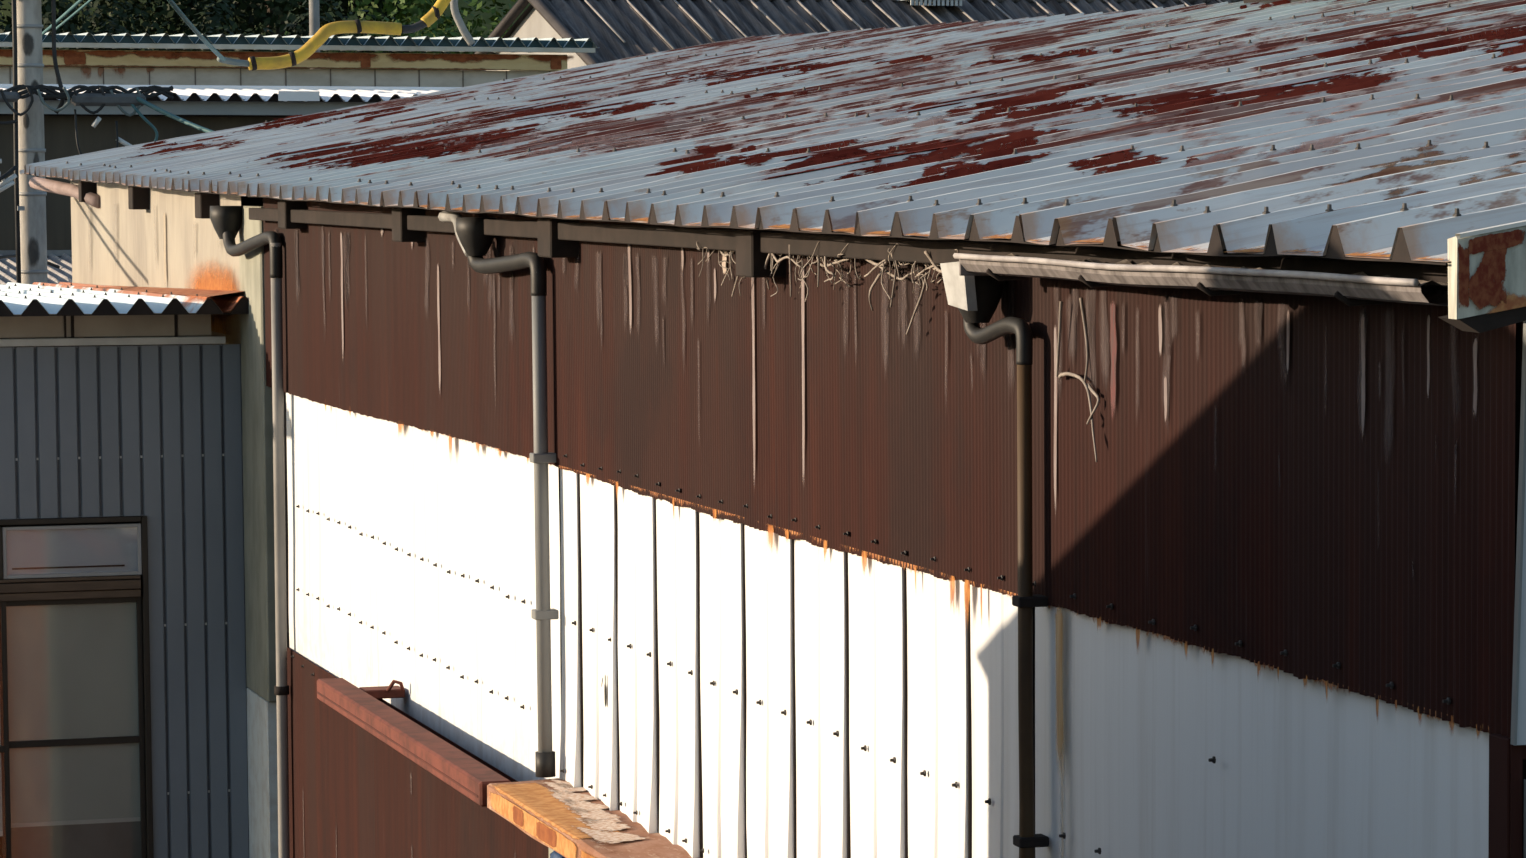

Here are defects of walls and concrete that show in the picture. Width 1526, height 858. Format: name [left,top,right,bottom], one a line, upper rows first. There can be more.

corrosion [421,204,648,221]
corrosion [672,222,1012,239]
corrosion [163,269,248,334]
corrosion [1415,229,1526,314]
corrosion [398,420,506,456]
corrosion [550,464,740,519]
corrosion [758,521,827,559]
corrosion [849,547,984,621]
corrosion [1048,605,1214,760]
corrosion [490,783,620,858]
peeling [543,779,645,845]